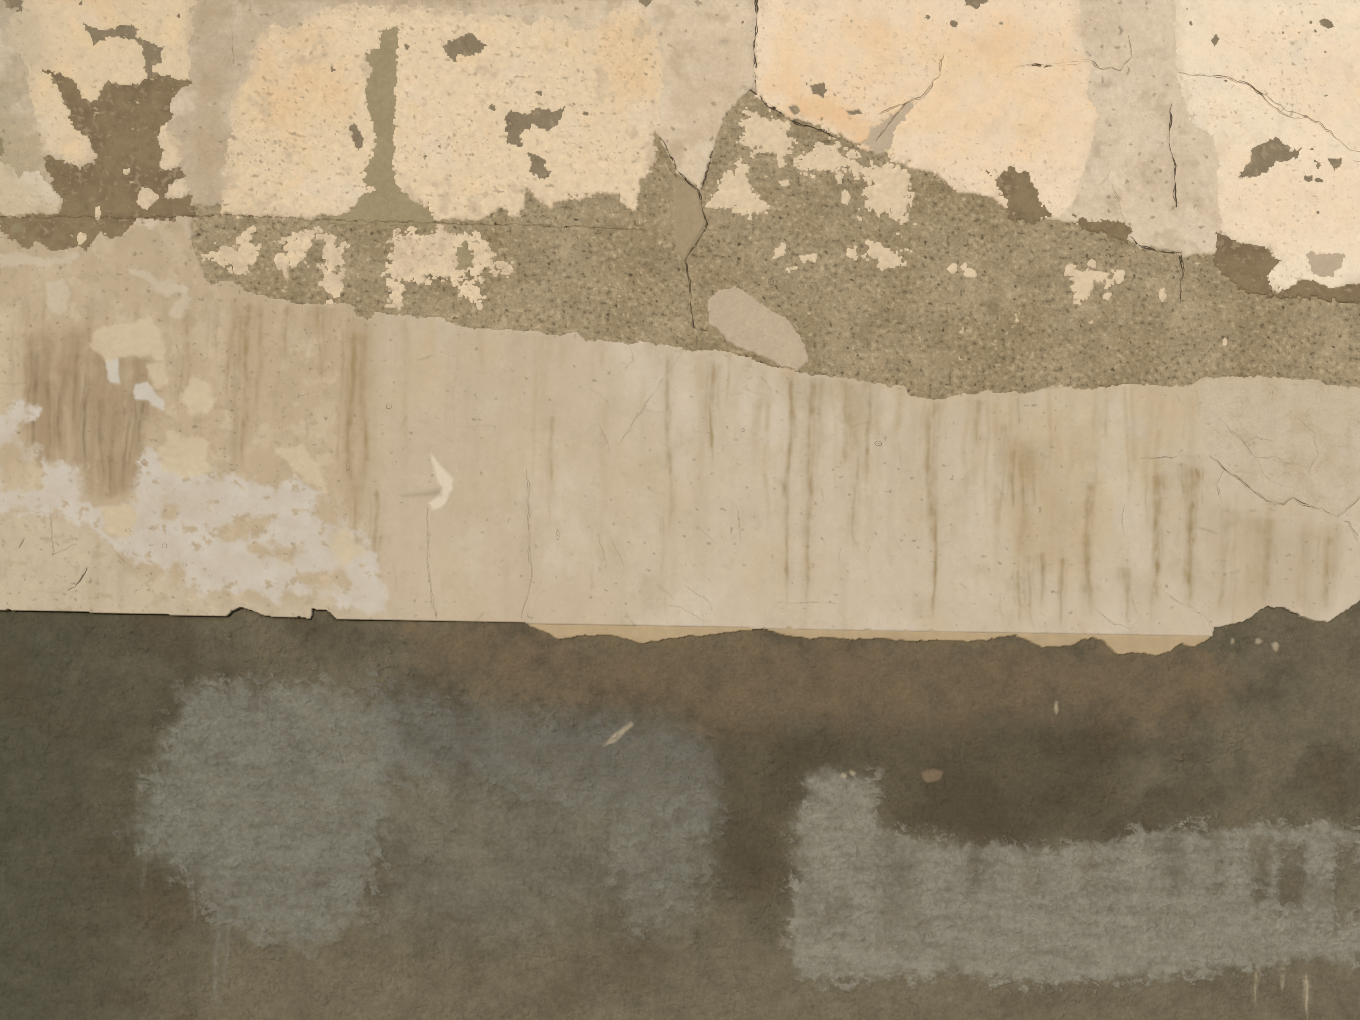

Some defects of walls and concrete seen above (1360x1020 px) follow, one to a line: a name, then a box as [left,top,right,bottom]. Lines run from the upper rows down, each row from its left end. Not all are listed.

flaking render [0,23,1360,400]
crack [1169,104,1177,207]
crack [1179,72,1360,162]
peeling [1282,18,1334,34]
flaking render [0,268,1267,766]
damp [650,345,729,623]
damp [770,367,886,622]
damp [899,389,1360,643]
crack [1157,422,1359,536]